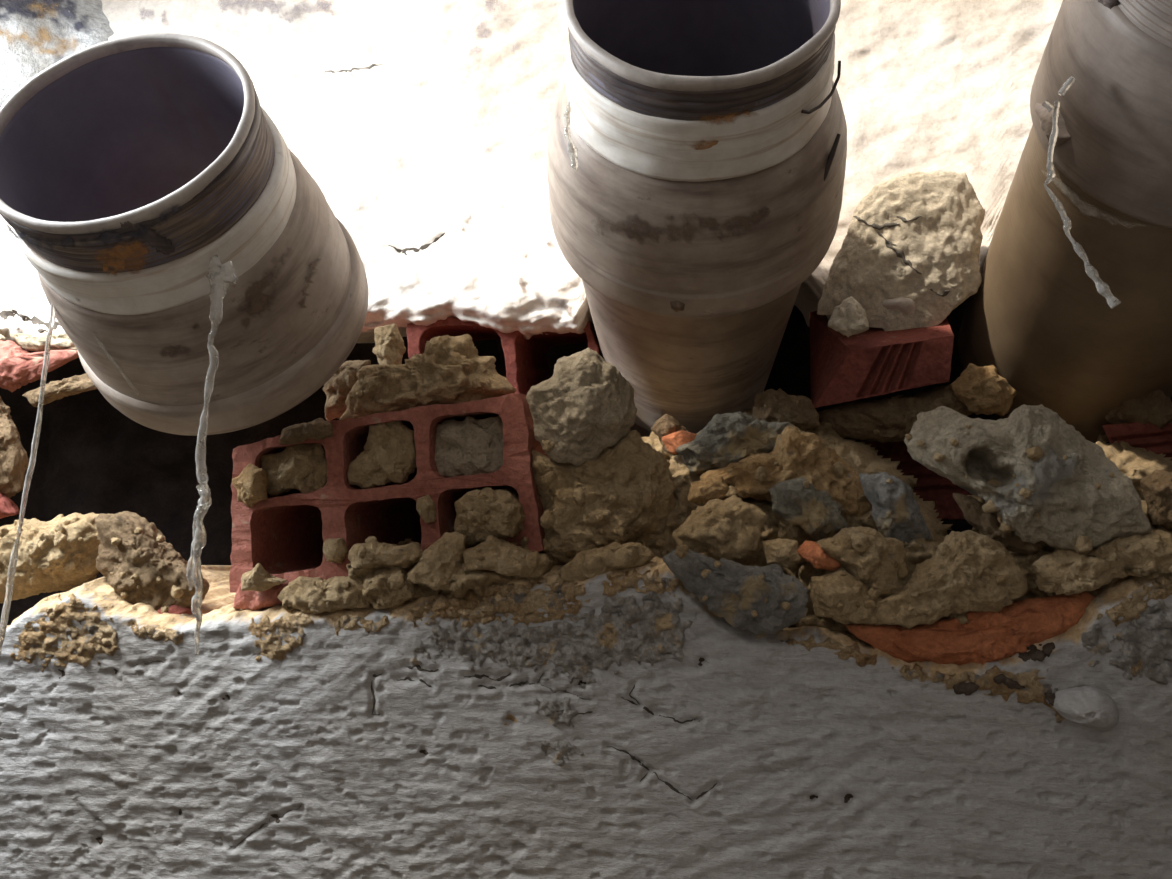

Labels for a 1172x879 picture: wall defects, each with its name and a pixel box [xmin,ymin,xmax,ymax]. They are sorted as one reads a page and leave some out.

crack [325,64,382,76]
crack [388,233,445,255]
crack [0,310,61,333]
spalling [10,593,120,679]
spalling [131,622,184,645]
spalling [248,612,314,661]
spalling [332,566,697,727]
spalling [1081,575,1172,684]
crack [371,665,593,715]
crack [621,685,702,723]
spalling [892,663,1065,723]
crack [607,746,717,800]